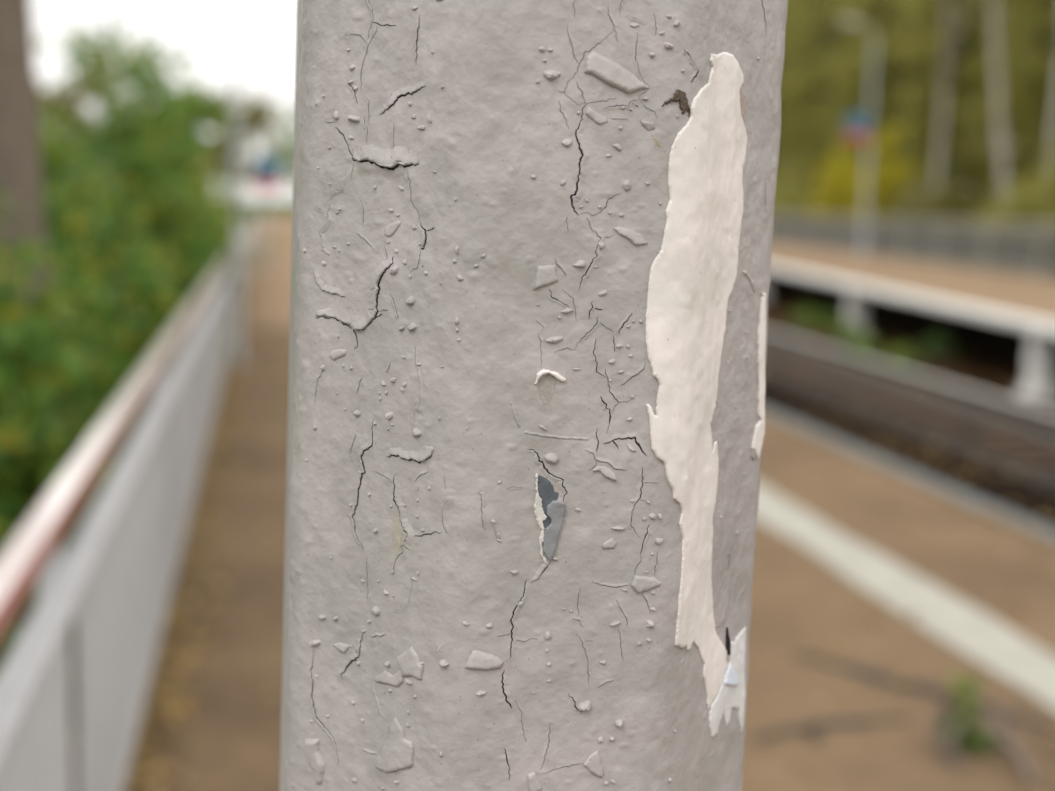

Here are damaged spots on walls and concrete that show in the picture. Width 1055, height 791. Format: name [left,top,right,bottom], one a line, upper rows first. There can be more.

crack [682,49,699,83]
crack [313,0,435,350]
crack [307,418,453,765]
crack [498,564,583,780]
peeling [534,473,548,565]
crack [529,449,567,502]
peeling [535,369,566,404]
crack [536,0,660,715]
peeling [645,52,748,738]
peeling [751,293,766,461]